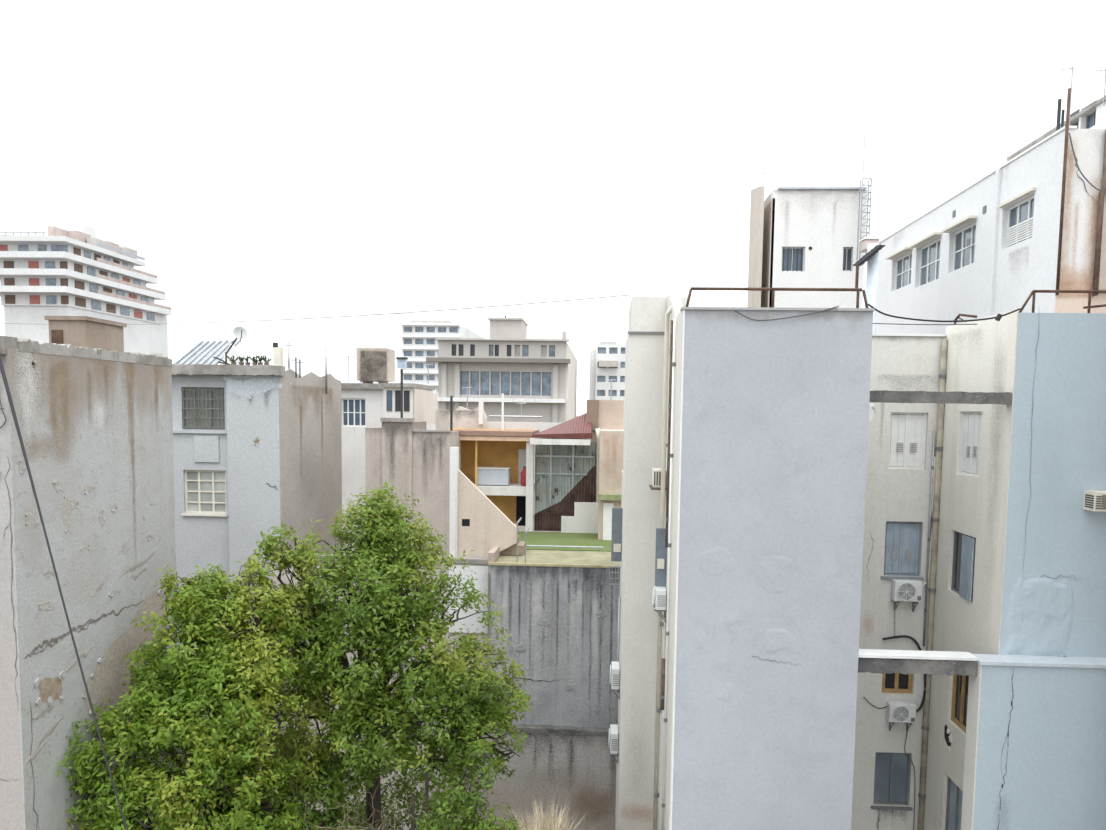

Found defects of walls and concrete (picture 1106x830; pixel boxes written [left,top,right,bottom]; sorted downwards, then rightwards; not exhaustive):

damp [14,338,138,581]
spalling [34,671,66,706]
crack [0,456,142,830]
damp [494,566,619,719]
crack [997,673,1014,830]